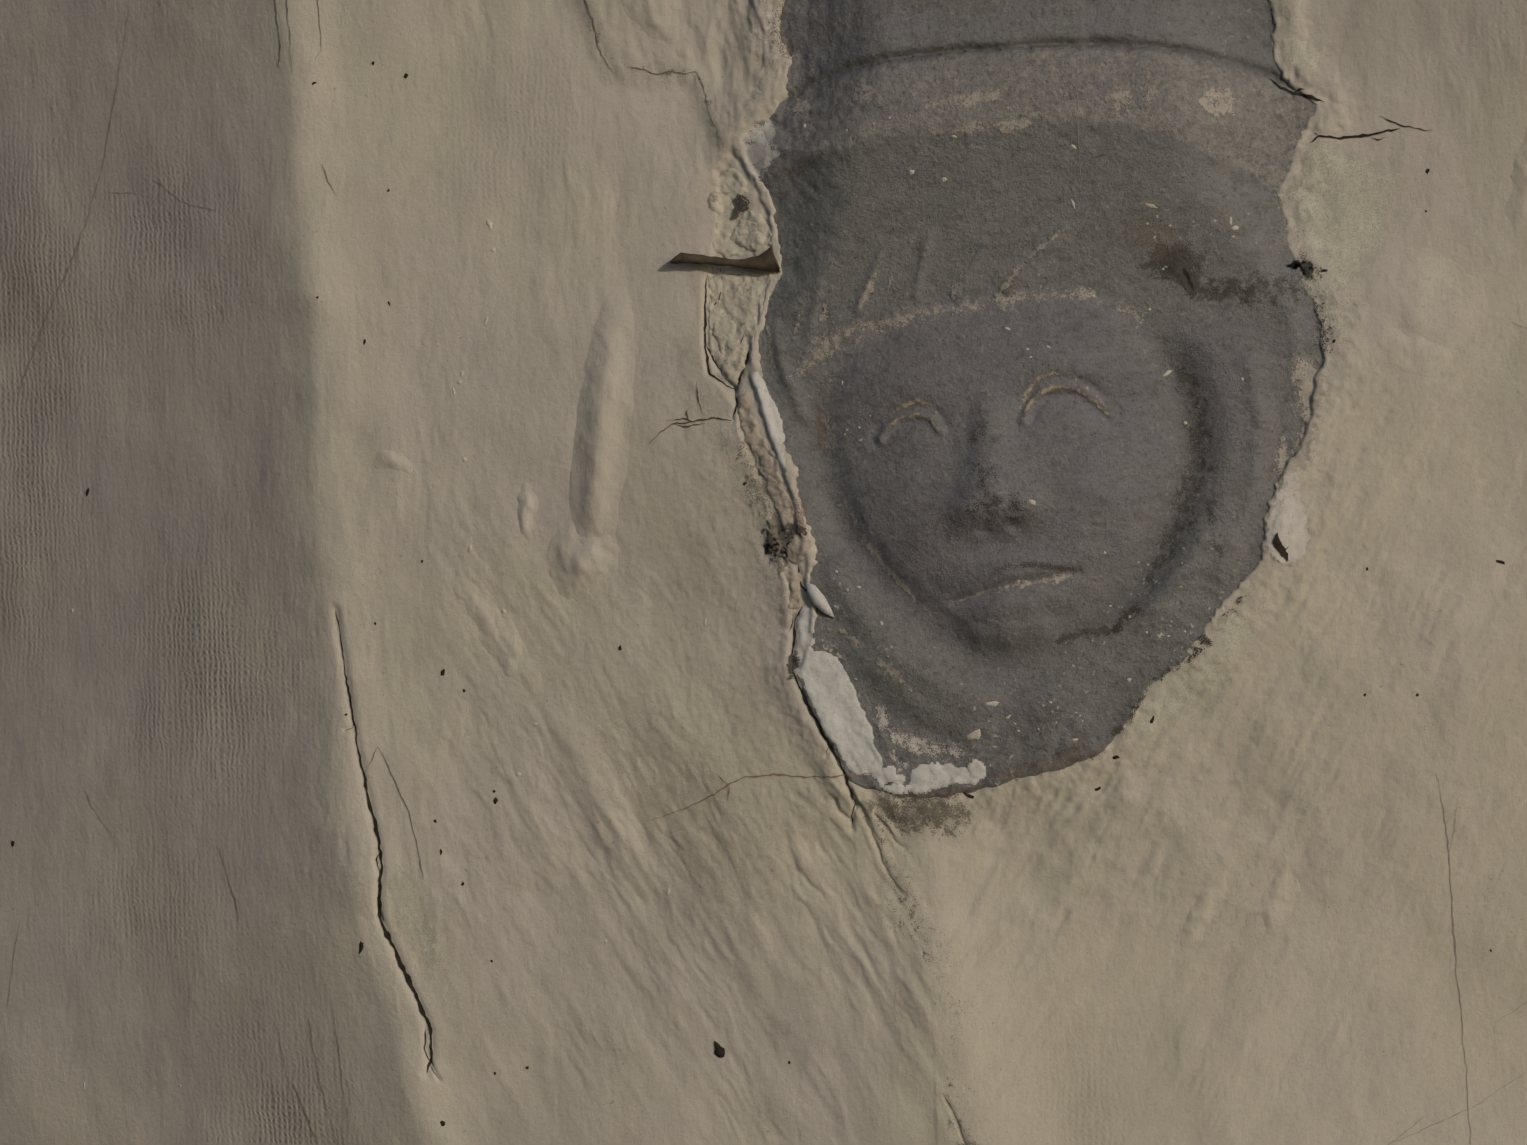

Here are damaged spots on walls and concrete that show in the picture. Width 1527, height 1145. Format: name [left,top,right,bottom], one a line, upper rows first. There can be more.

crack [1270,79,1431,143]
peeling [707,0,986,795]
peeling [1264,349,1327,567]
crack [336,614,438,1077]